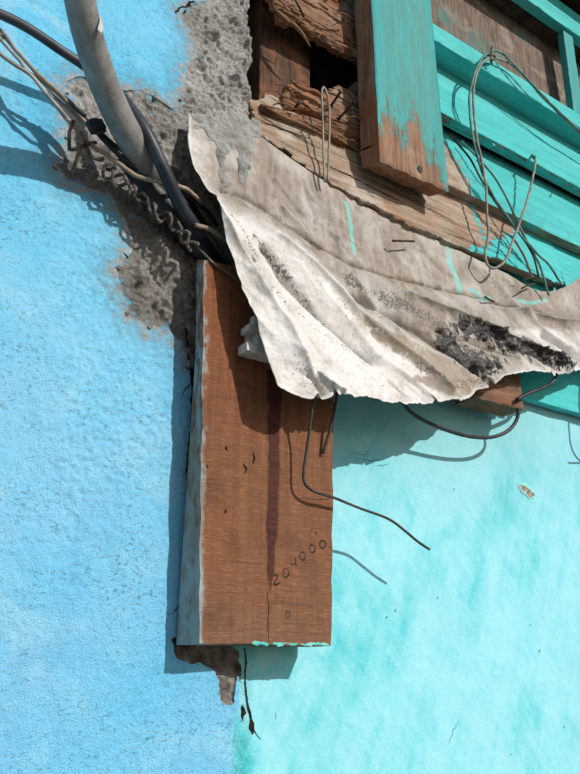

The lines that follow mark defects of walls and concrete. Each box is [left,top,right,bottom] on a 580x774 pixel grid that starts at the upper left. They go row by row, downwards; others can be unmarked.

flaking render [124,0,253,267]
flaking render [52,77,197,374]
peeling [518,483,536,499]
flaking render [171,637,242,705]
crack [241,648,261,739]